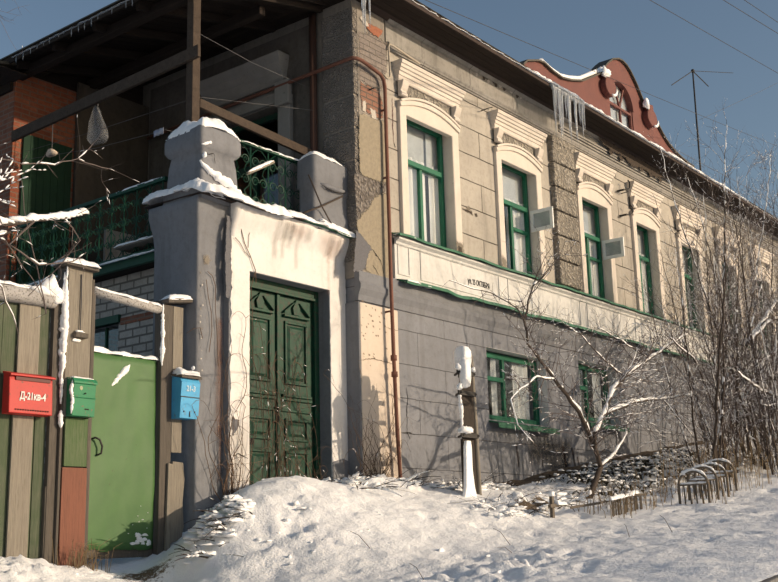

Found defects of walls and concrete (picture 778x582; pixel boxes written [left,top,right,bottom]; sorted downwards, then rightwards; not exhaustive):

flaking render [358,16,388,119]
flaking render [354,173,386,213]
peeling [353,230,372,272]